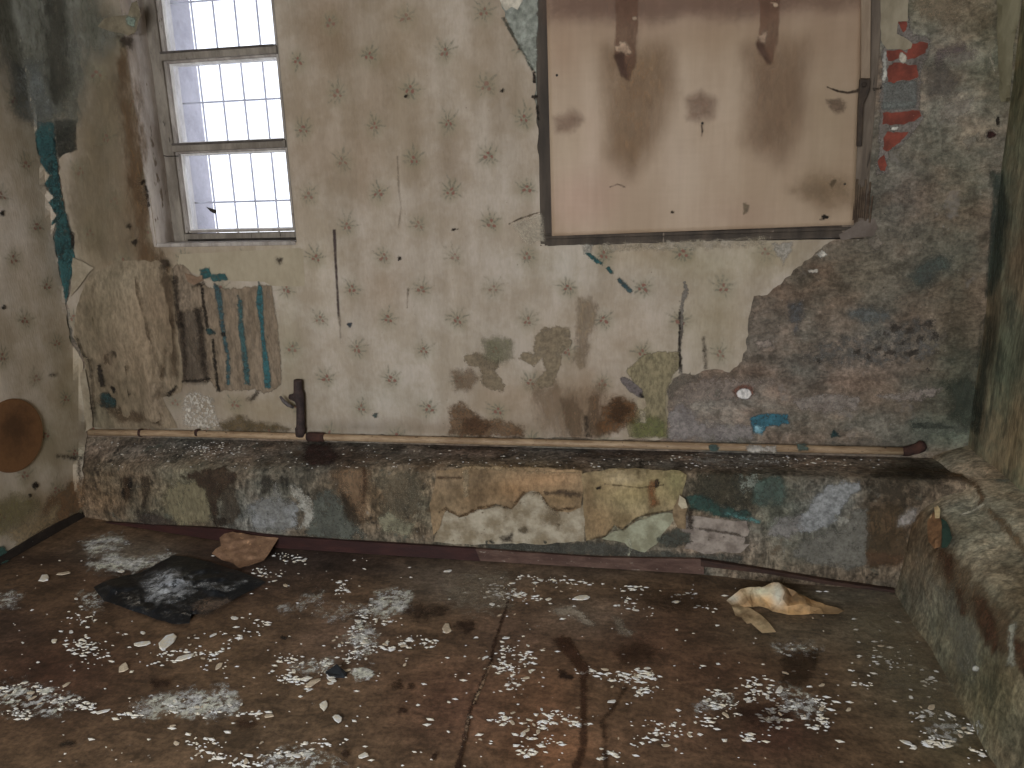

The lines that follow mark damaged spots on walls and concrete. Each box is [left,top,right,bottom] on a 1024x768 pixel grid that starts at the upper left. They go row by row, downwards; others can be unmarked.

water stain [611,54,663,162]
spalling [876,21,931,175]
peeling [199,267,228,282]
flaking render [583,238,792,260]
water stain [453,299,601,437]
flaking render [667,372,773,441]
spalling [806,319,939,371]
flaking render [876,387,942,402]
peeling [682,509,749,554]
crack [455,587,514,768]